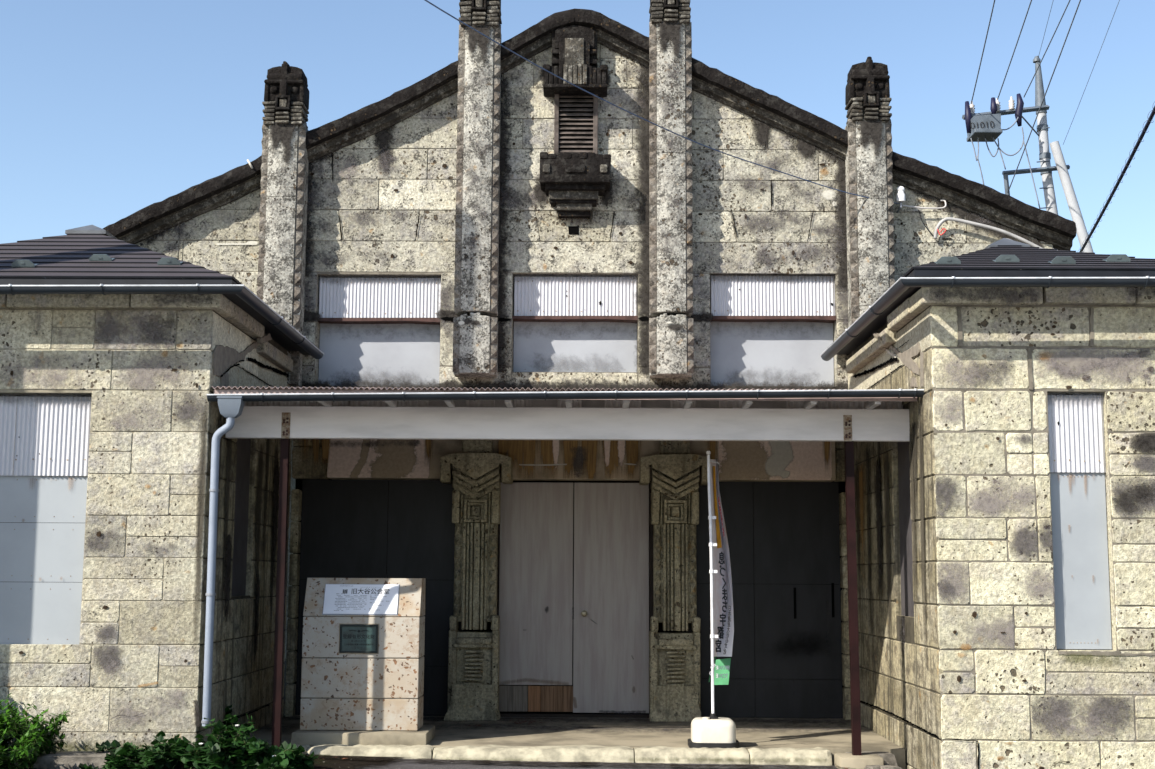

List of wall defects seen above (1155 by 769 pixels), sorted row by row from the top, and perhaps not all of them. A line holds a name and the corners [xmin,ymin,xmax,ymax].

water stain [467,24,492,61]
water stain [658,22,681,77]
water stain [298,63,848,390]
crack [220,357,289,387]
water stain [935,359,1014,421]
peeling [327,439,430,478]
peeling [718,441,832,480]
water stain [1112,433,1155,518]
water stain [855,442,905,644]
water stain [909,415,1035,639]
water stain [94,625,120,672]
water stain [1031,696,1133,736]